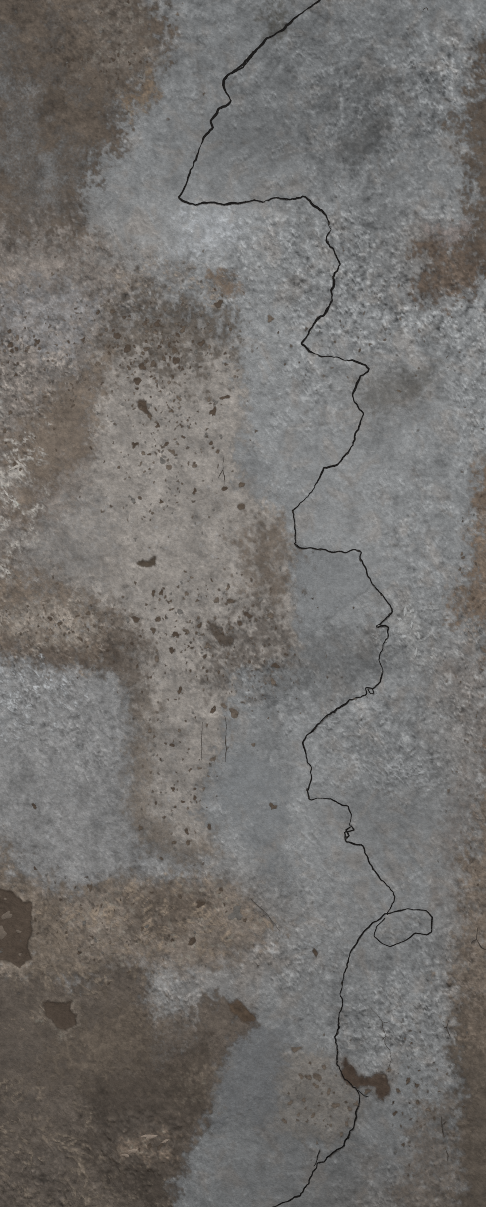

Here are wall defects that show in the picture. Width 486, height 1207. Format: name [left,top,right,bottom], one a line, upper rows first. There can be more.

peeling [0,319,370,982]
crack [178,0,433,1207]
spalling [34,998,82,1041]
spalling [341,1057,431,1127]